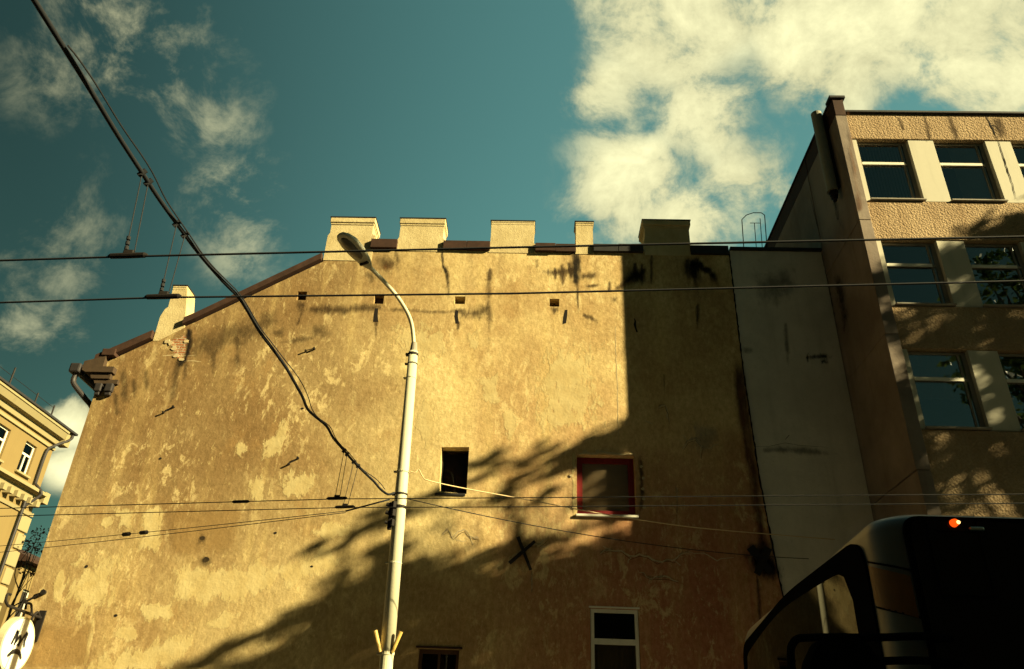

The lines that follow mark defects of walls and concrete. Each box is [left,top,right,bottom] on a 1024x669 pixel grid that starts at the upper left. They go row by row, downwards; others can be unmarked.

leakage [548,253,596,299]
leakage [608,255,652,290]
leakage [685,259,716,288]
spalling [164,335,200,362]
leakage [736,366,777,619]
crack [442,529,478,545]